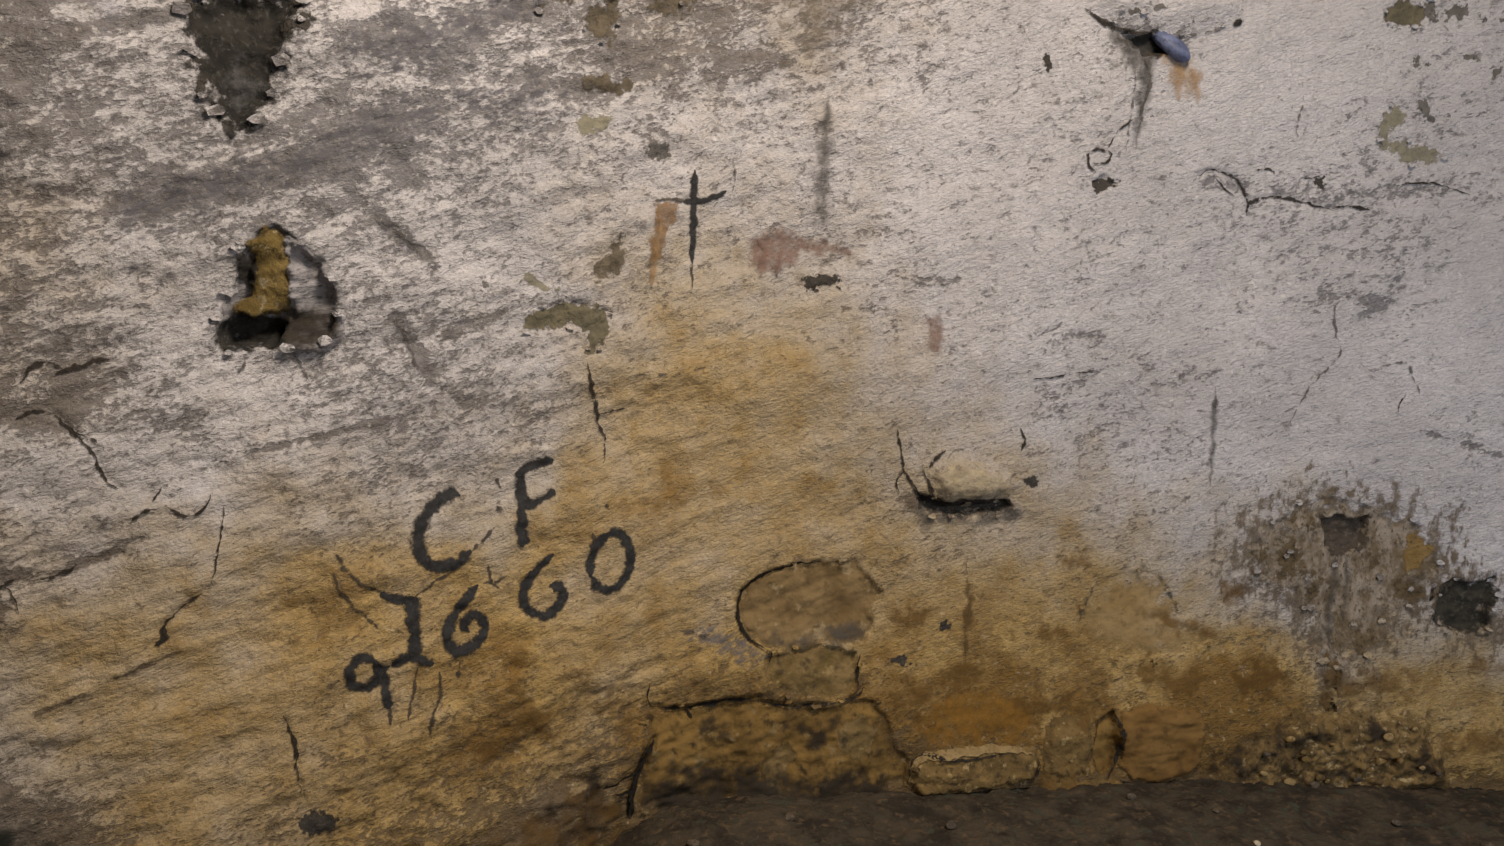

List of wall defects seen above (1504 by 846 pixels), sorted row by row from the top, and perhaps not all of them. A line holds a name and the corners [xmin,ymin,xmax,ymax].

spalling [1384,0,1504,29]
spalling [172,0,317,139]
peeling [1376,99,1449,167]
crack [1199,168,1370,214]
crack [1402,182,1470,195]
spalling [210,224,348,355]
crack [895,429,919,497]
leakage [1211,461,1504,709]
peeling [1237,484,1504,682]
leakage [799,719,835,749]
leakage [1368,720,1389,742]
leakage [641,762,889,808]